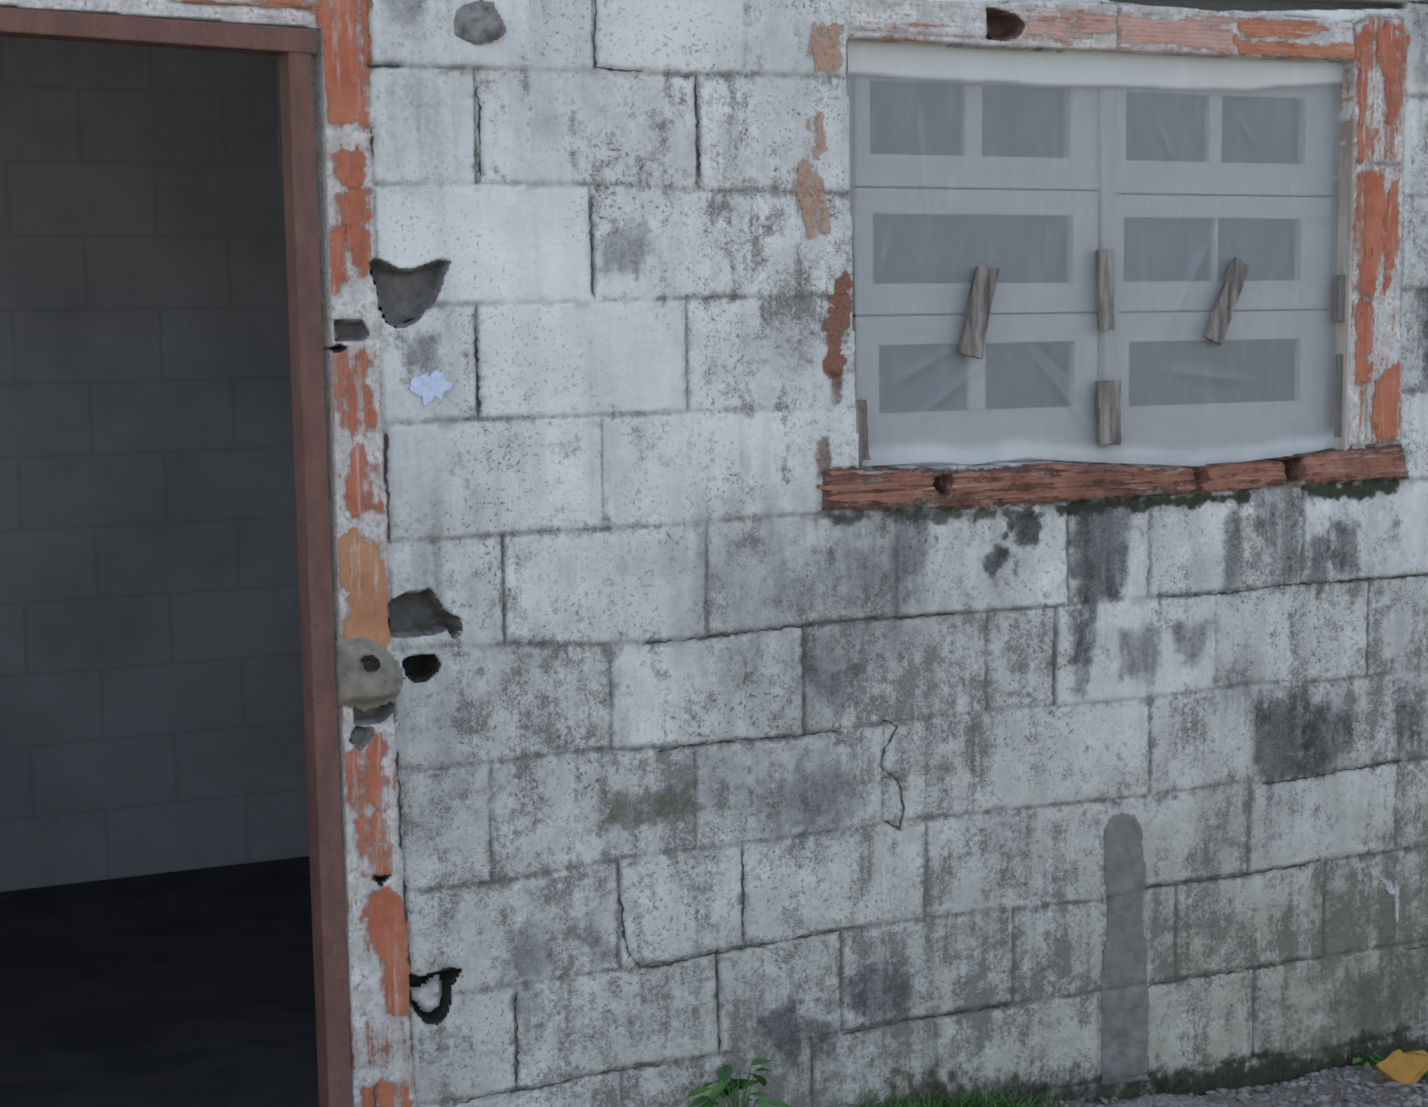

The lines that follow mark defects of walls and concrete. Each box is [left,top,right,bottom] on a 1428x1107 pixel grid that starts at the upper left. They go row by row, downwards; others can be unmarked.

peeling [250,0,373,131]
peeling [808,21,844,77]
peeling [329,148,451,328]
peeling [791,111,831,239]
peeling [817,7,1411,512]
peeling [330,319,462,648]
spalling [402,654,441,683]
crack [657,730,838,752]
crack [881,719,905,830]
leakage [1256,688,1352,785]
peeling [345,700,462,1025]
leakage [1382,879,1399,921]